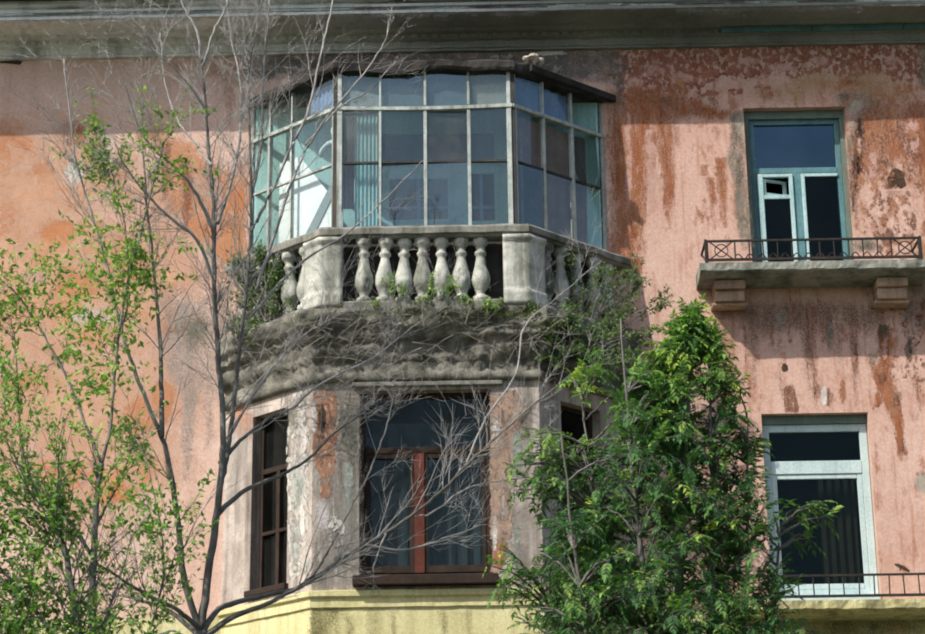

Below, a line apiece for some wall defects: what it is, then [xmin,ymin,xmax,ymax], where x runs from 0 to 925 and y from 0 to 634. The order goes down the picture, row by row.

leakage [725,109,754,253]
leakage [714,295,890,390]
peeling [285,388,356,583]
peeling [487,390,530,573]